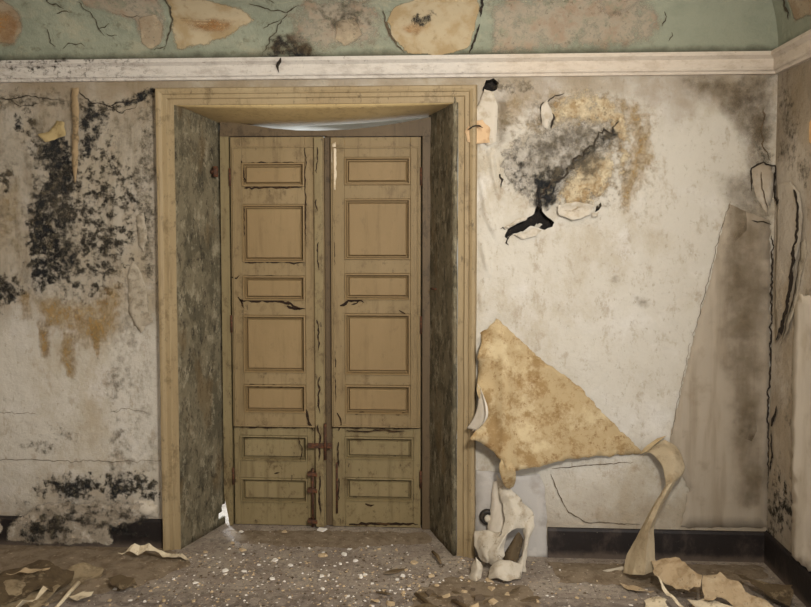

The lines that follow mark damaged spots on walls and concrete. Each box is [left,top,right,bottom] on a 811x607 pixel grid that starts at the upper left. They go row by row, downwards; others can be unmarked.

flaking render [289,0,479,55]
peeling [492,0,658,51]
damp [622,103,650,206]
damp [0,88,155,376]
peeling [475,470,502,531]
peeling [504,474,548,557]